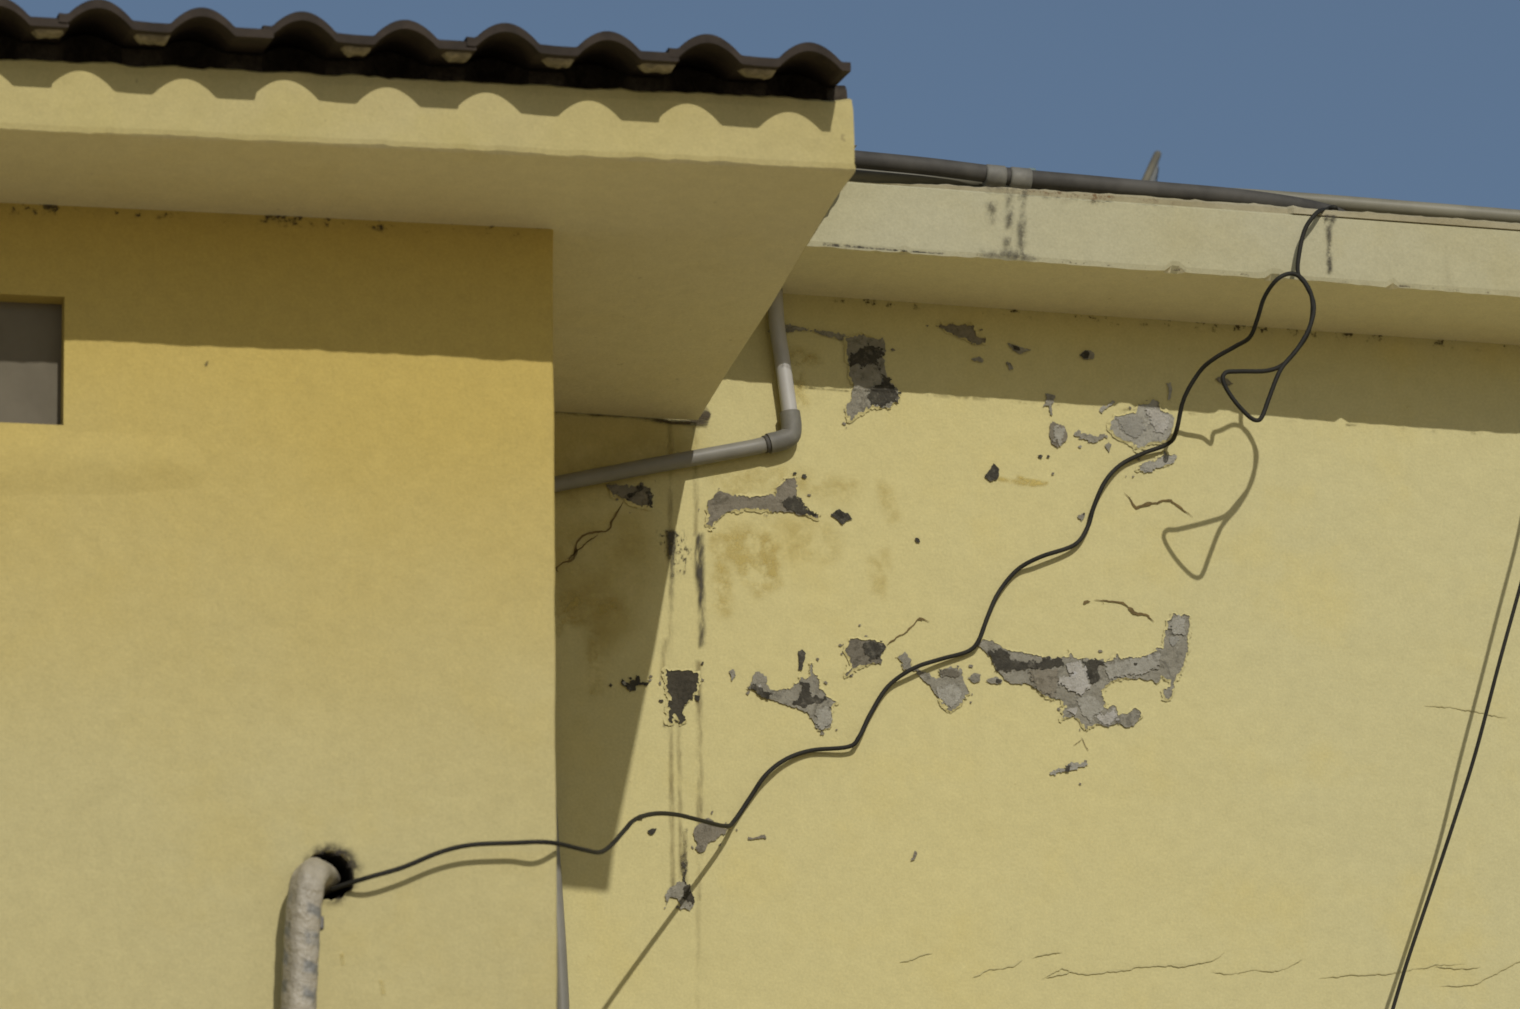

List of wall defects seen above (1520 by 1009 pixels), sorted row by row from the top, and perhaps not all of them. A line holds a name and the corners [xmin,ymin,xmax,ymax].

peeling [768,323,902,429]
peeling [1038,382,1177,477]
peeling [698,472,852,531]
crack [1126,494,1189,514]
crack [555,501,624,572]
crack [1083,600,1154,622]
peeling [609,662,704,726]
peeling [729,611,1193,735]
peeling [691,811,766,853]
peeling [664,877,695,911]
crack [973,951,1520,986]